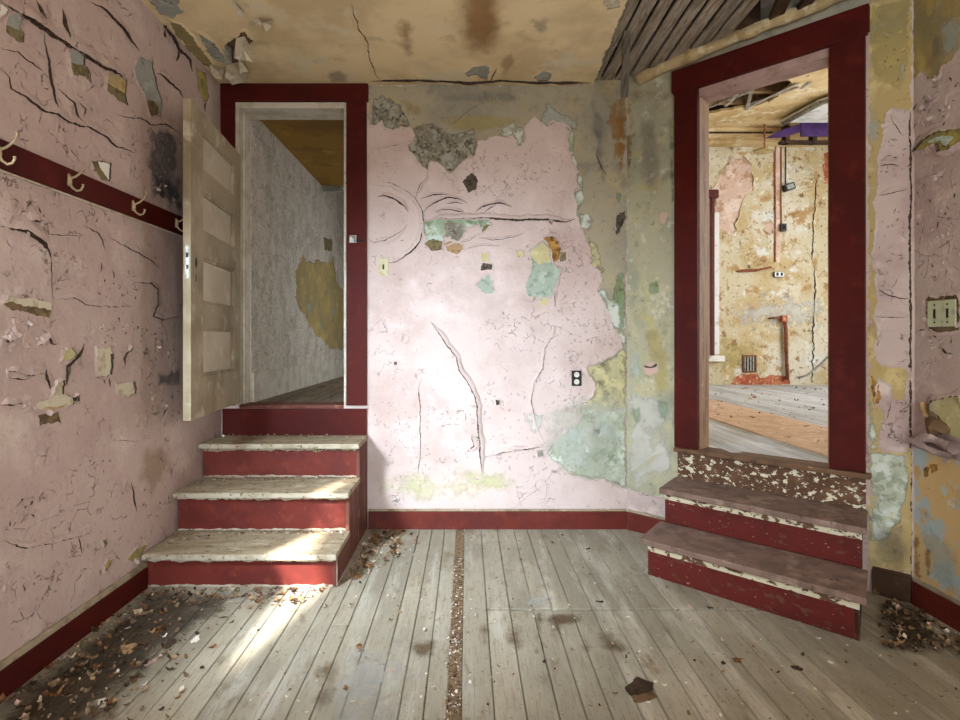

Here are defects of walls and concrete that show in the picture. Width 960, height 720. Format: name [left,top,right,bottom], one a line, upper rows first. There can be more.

crack [0,0,179,162]
peeling [147,0,273,104]
crack [349,3,589,86]
damp [149,133,181,209]
crack [367,173,576,263]
peeling [0,286,56,353]
peeling [21,377,80,430]
peeling [295,236,344,352]
crack [431,322,558,474]
peeling [367,0,960,599]
crack [810,179,818,383]
crack [872,110,953,581]